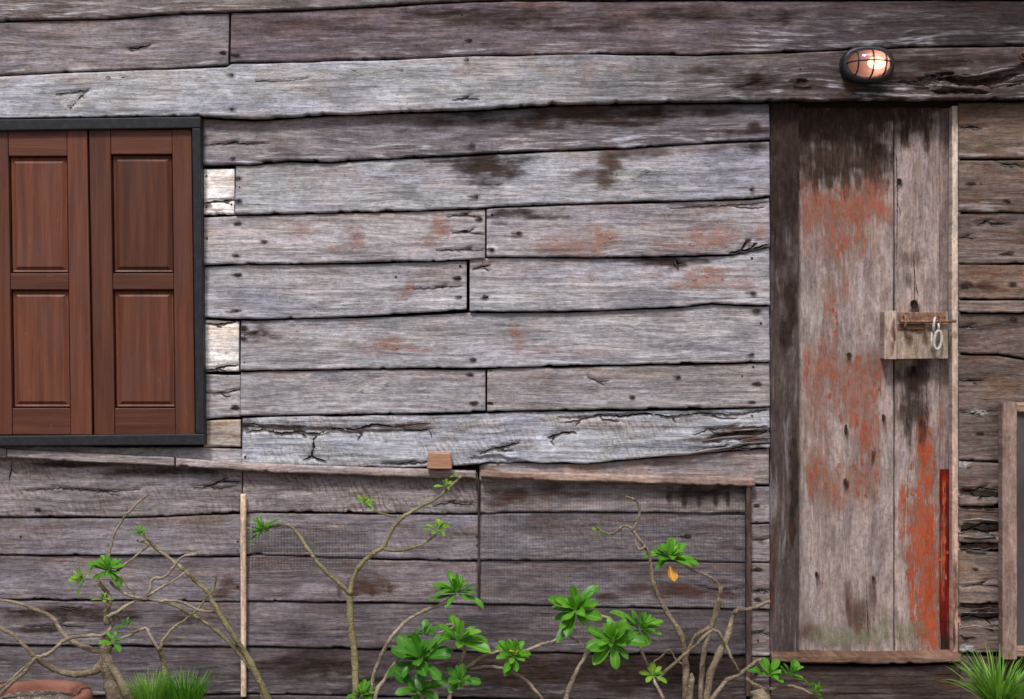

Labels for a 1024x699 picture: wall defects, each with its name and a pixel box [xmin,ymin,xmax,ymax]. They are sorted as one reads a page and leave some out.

damp [432,155,530,185]
damp [577,149,656,186]
damp [749,103,938,264]
peeling [800,181,894,255]
peeling [803,280,881,509]
crack [246,423,432,465]
crack [480,442,520,454]
crack [547,409,770,451]
peeling [898,415,999,652]
crack [958,485,999,538]
crack [961,580,999,627]